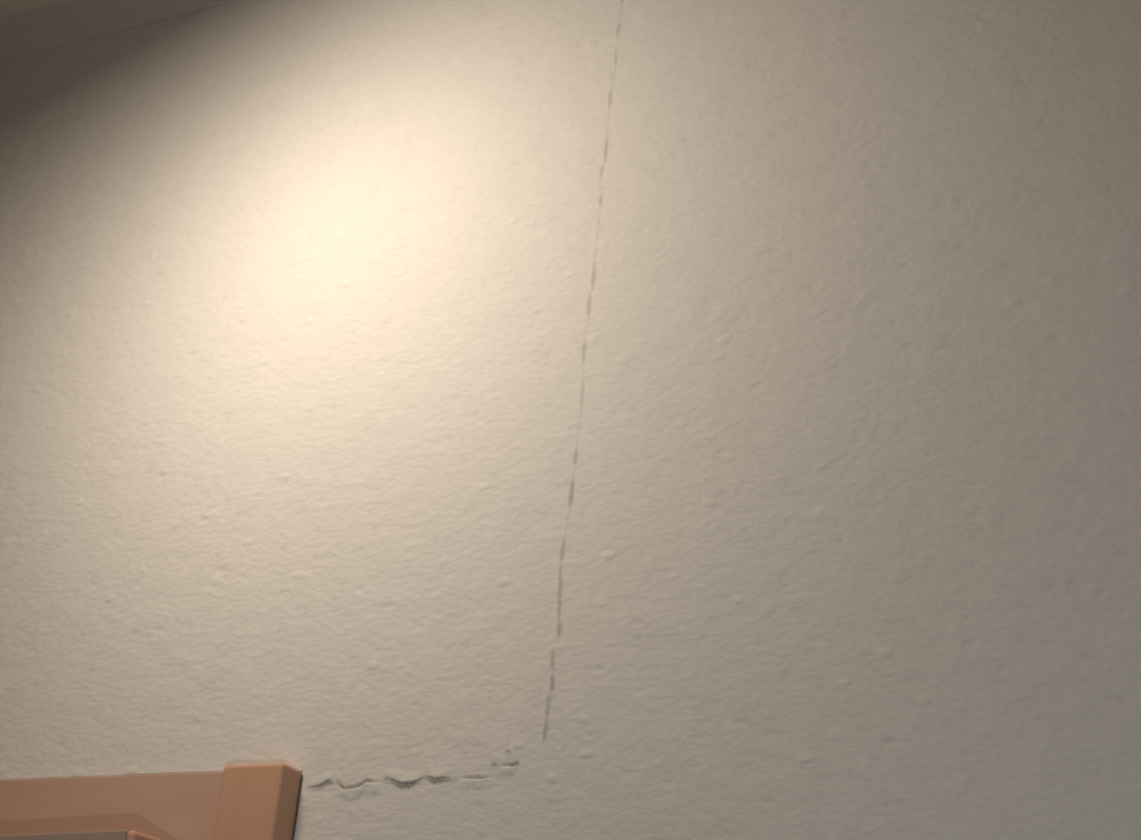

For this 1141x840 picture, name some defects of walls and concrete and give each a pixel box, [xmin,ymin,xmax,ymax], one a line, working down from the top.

crack [306,762,517,802]